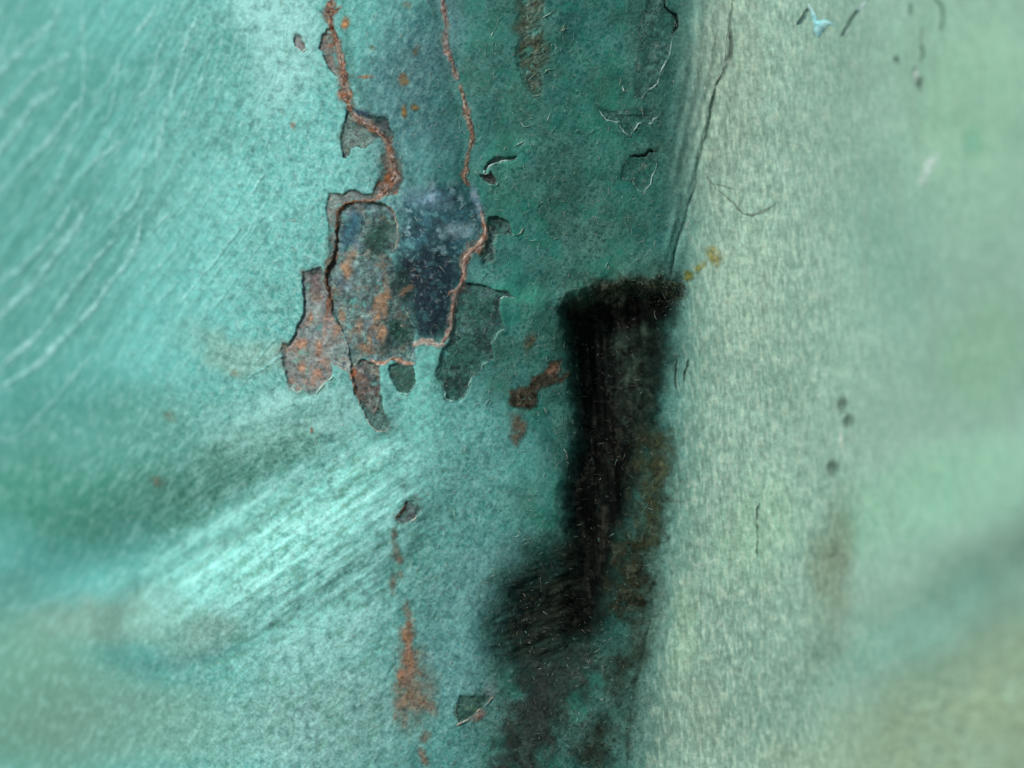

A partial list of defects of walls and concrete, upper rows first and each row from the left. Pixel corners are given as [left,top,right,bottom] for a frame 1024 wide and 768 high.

spalling [294,29,341,76]
peeling [577,0,678,137]
crack [703,27,733,90]
peeling [610,150,657,199]
peeling [282,110,538,432]
water stain [633,433,673,551]
corrosion [396,608,434,710]
peeling [455,689,494,726]
water stain [490,650,597,768]
water stain [574,721,609,768]